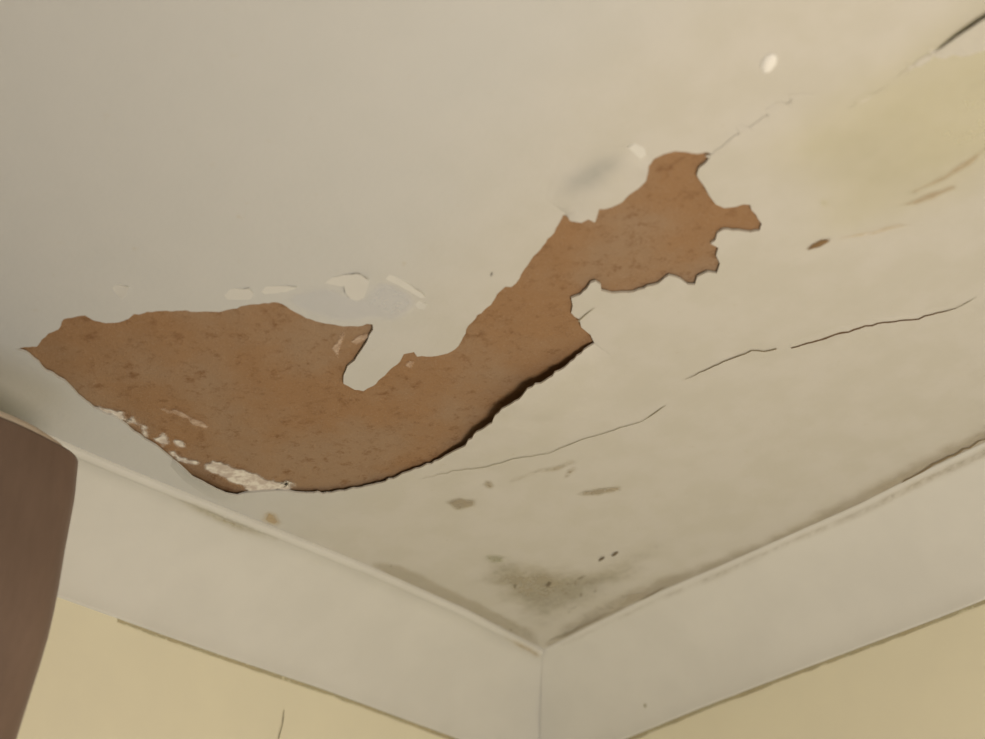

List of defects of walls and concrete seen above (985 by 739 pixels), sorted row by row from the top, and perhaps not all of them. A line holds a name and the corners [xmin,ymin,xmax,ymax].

peeling [848,19,985,110]
peeling [20,92,816,504]
crack [690,297,977,378]